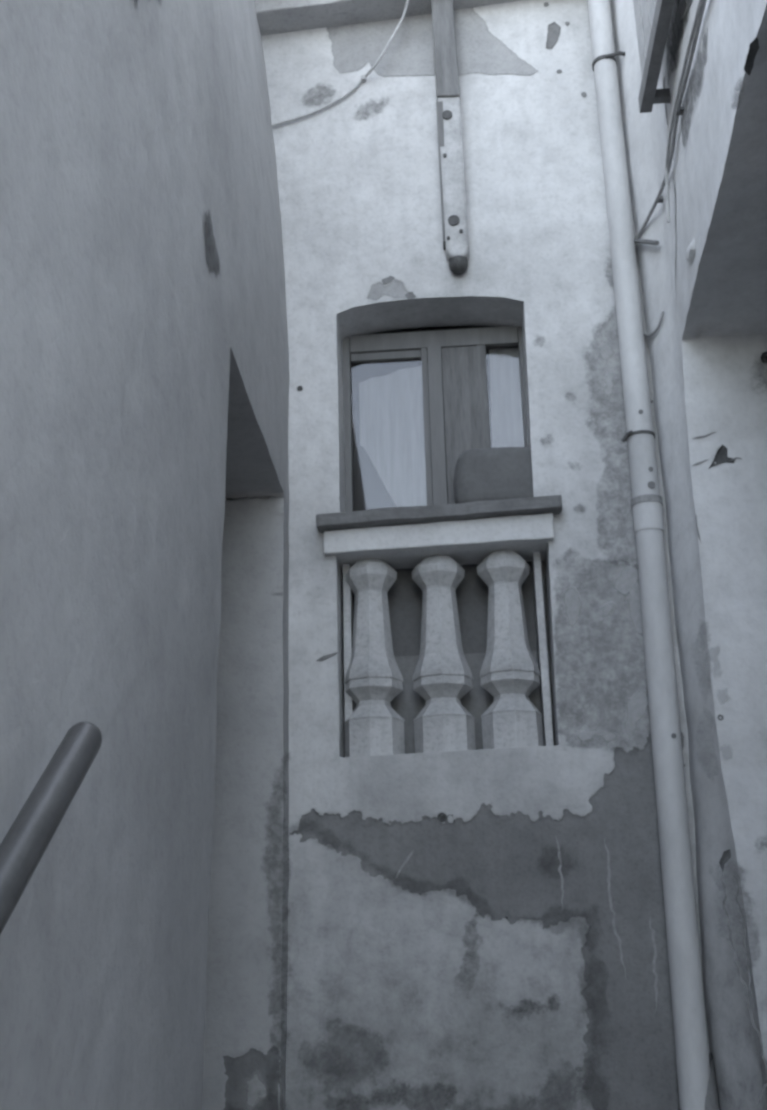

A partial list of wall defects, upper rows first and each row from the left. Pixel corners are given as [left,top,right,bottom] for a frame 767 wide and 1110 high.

flaking render [326,13,435,77]
flaking render [454,7,538,76]
spalling [546,22,570,49]
spalling [367,275,416,300]
spalling [692,445,742,468]
flaking render [290,734,679,1110]